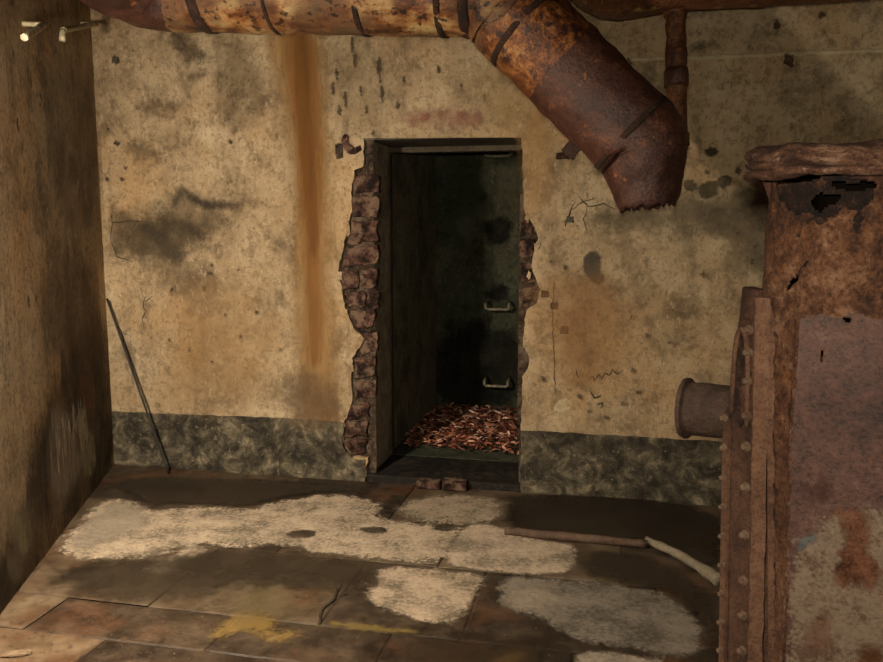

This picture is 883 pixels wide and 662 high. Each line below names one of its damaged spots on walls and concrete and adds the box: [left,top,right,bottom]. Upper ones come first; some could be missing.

water stain [112,188,229,261]
corrosion [270,34,336,421]
flaking render [335,134,382,473]
flaking render [517,193,543,440]
water stain [119,477,366,505]
water stain [581,551,719,662]